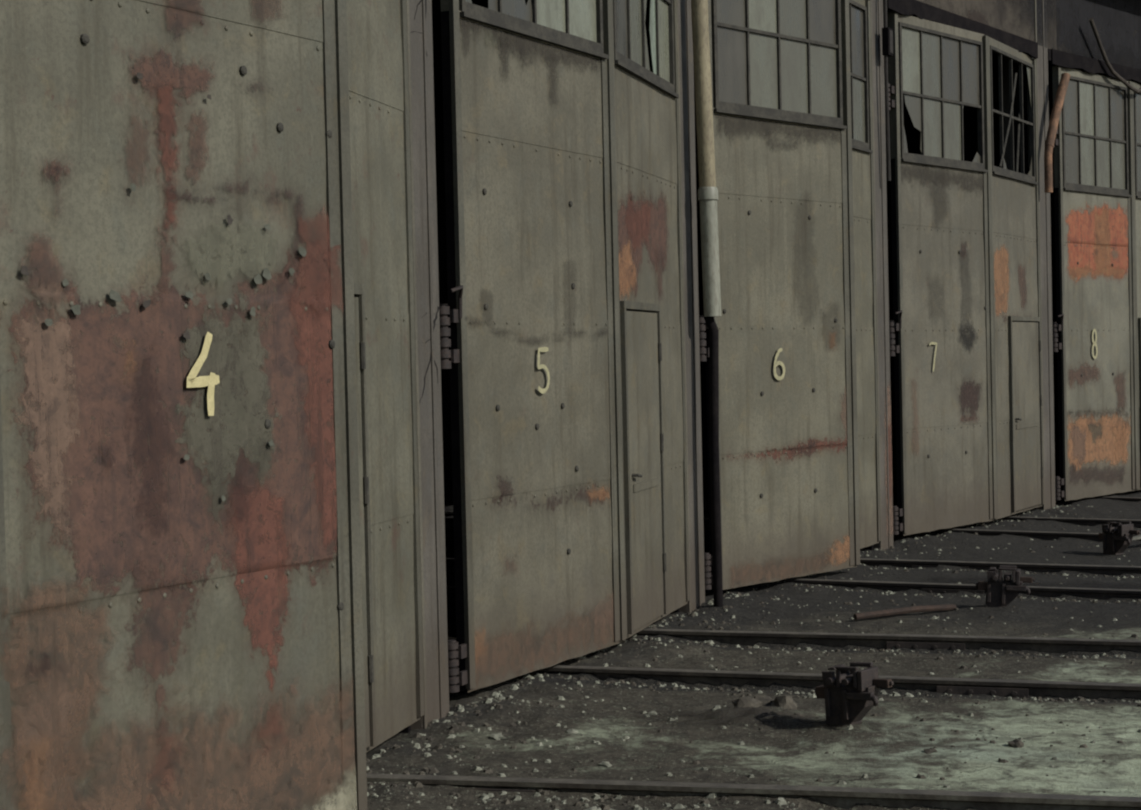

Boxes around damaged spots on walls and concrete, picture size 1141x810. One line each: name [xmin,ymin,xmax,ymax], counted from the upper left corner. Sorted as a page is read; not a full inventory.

corrosion [618,192,669,297]
corrosion [0,240,337,750]
corrosion [751,438,847,463]
corrosion [1067,375,1131,472]